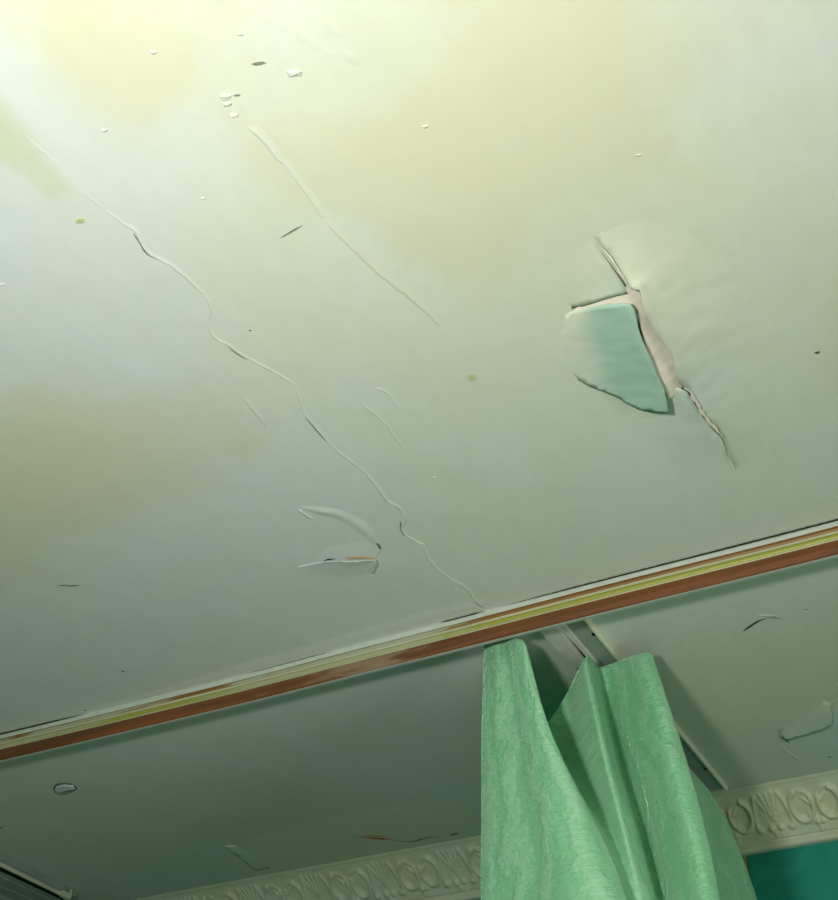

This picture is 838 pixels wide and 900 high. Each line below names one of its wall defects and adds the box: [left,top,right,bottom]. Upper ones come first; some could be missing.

crack [25,135,838,623]
flaking render [561,218,778,476]
crack [0,714,83,735]
crack [743,613,782,632]